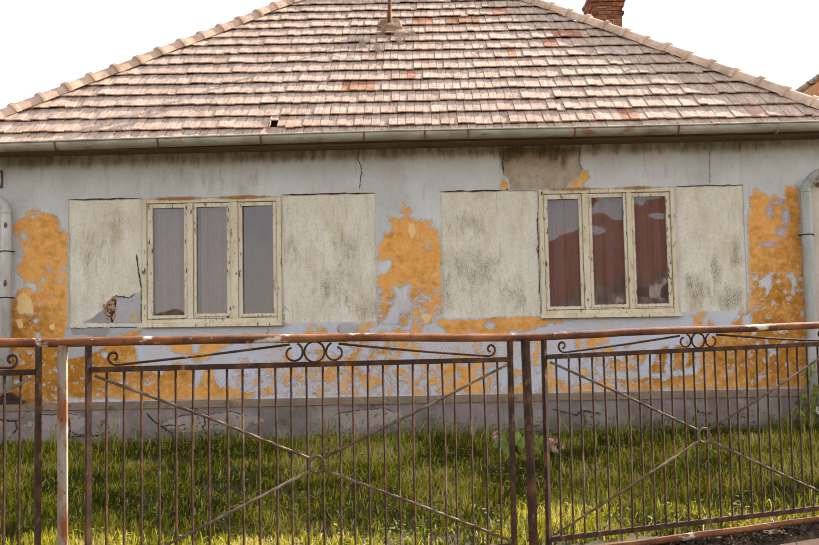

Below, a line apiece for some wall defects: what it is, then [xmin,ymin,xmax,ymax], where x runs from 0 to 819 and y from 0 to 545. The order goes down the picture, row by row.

crack [285,150,364,195]
peeling [498,146,591,191]
peeling [9,209,69,403]
peeling [68,185,807,401]
spalling [23,413,57,431]
spalling [68,412,85,434]
spalling [162,411,264,433]
spalling [332,408,406,429]